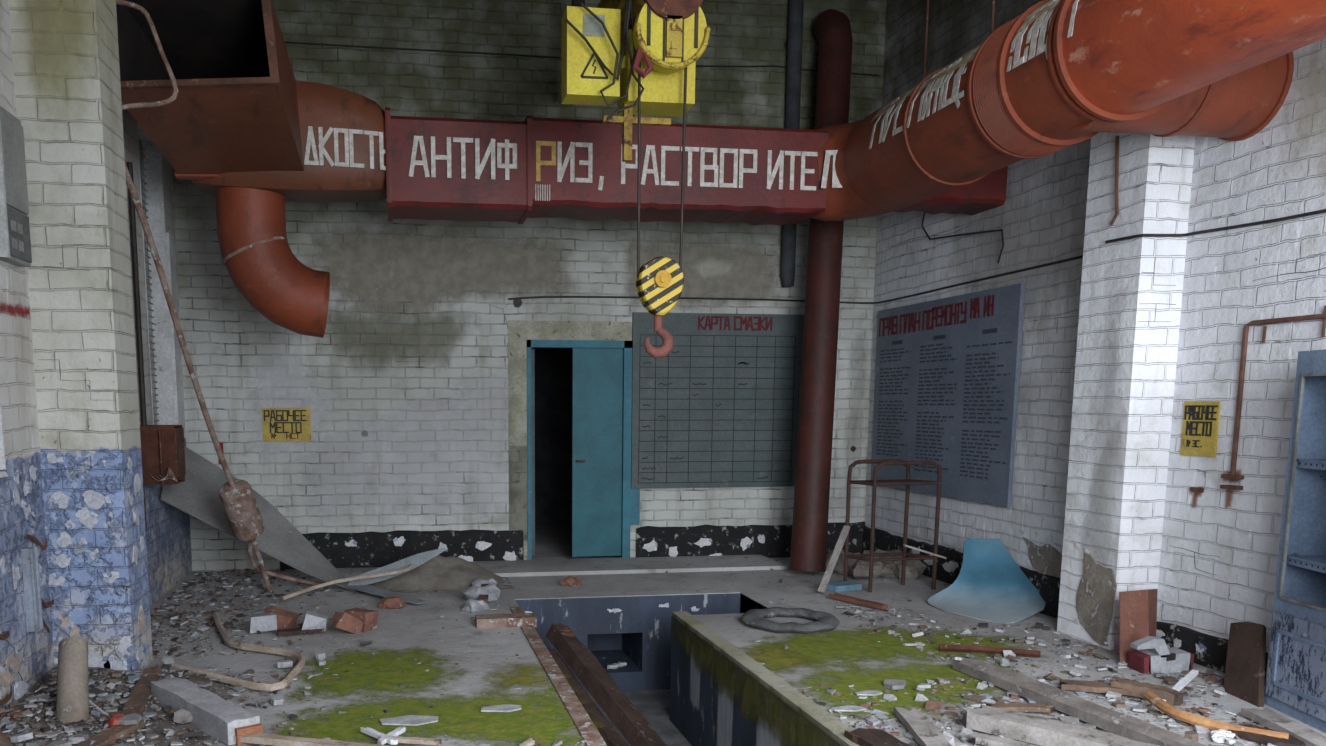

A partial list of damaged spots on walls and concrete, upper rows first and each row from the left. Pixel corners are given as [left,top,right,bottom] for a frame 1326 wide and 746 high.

leakage [28,0,82,87]